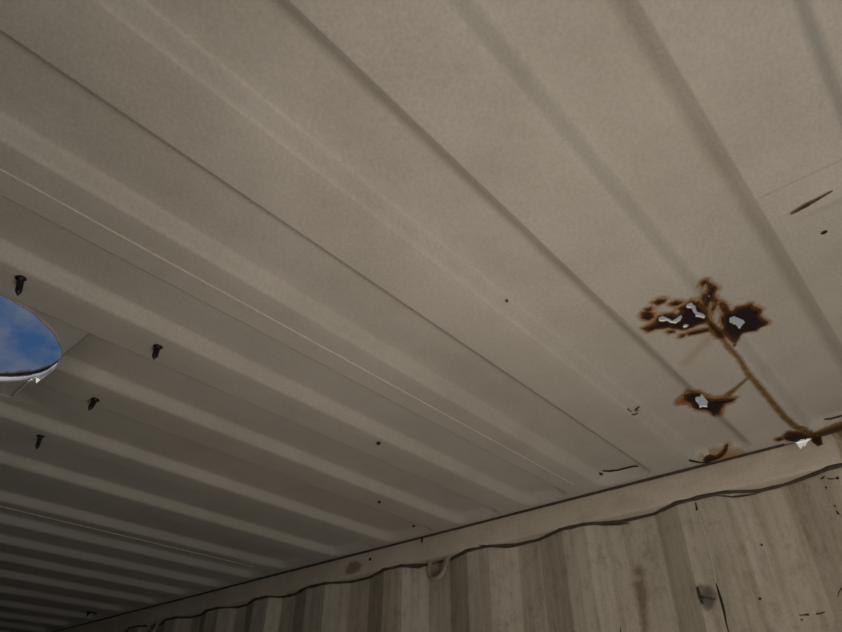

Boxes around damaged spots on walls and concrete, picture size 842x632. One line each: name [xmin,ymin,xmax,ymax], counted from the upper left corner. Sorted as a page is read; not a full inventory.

rust [640,278,842,451]
crack [695,503,729,632]